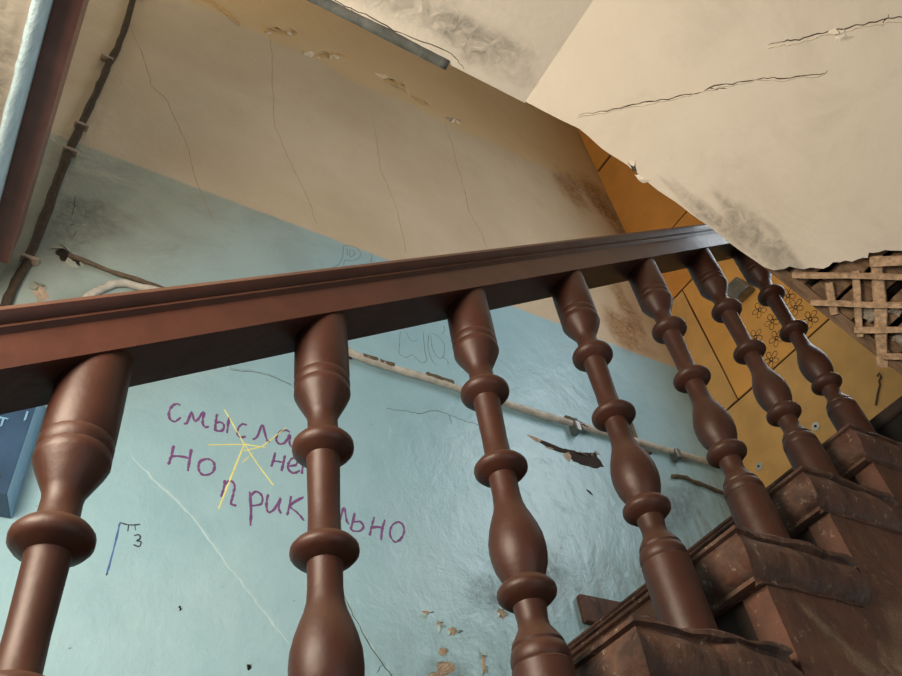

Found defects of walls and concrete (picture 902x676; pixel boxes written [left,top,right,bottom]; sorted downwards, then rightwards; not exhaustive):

crack [769,15,902,48]
crack [579,71,827,117]
spalling [790,250,902,368]
spalling [527,435,604,469]
crack [344,595,394,676]
spalling [419,611,463,676]